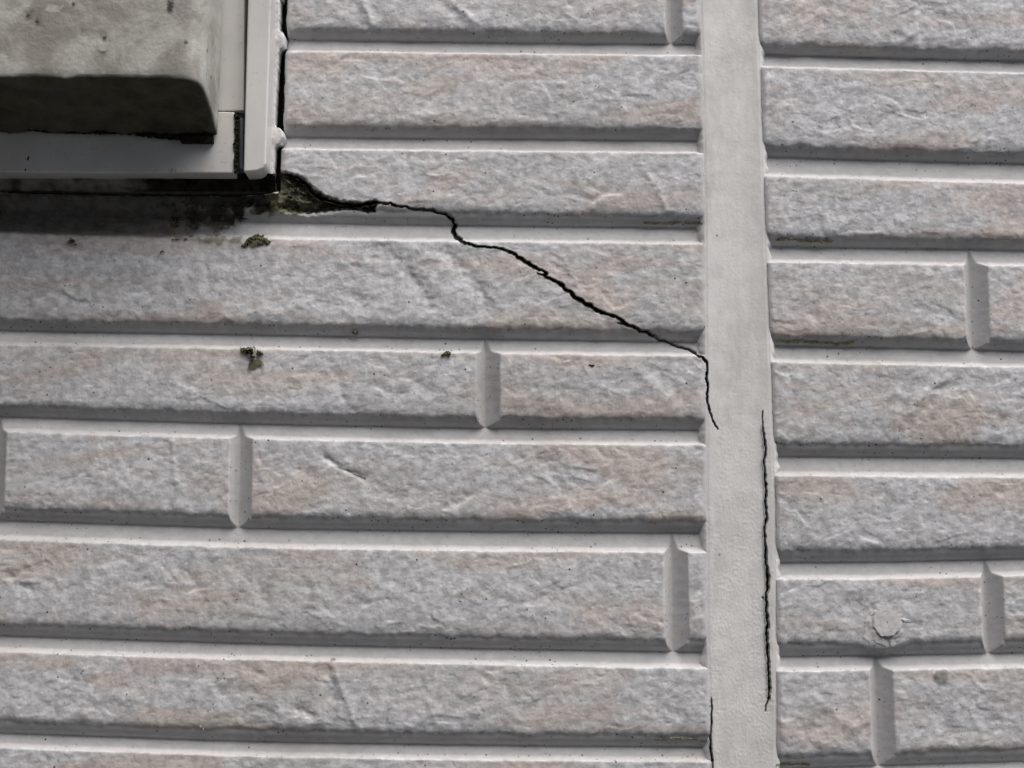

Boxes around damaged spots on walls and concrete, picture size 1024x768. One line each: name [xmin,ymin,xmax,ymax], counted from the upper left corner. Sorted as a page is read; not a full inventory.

damp [126,173,285,237]
crack [284,174,719,429]
crack [761,418,772,711]